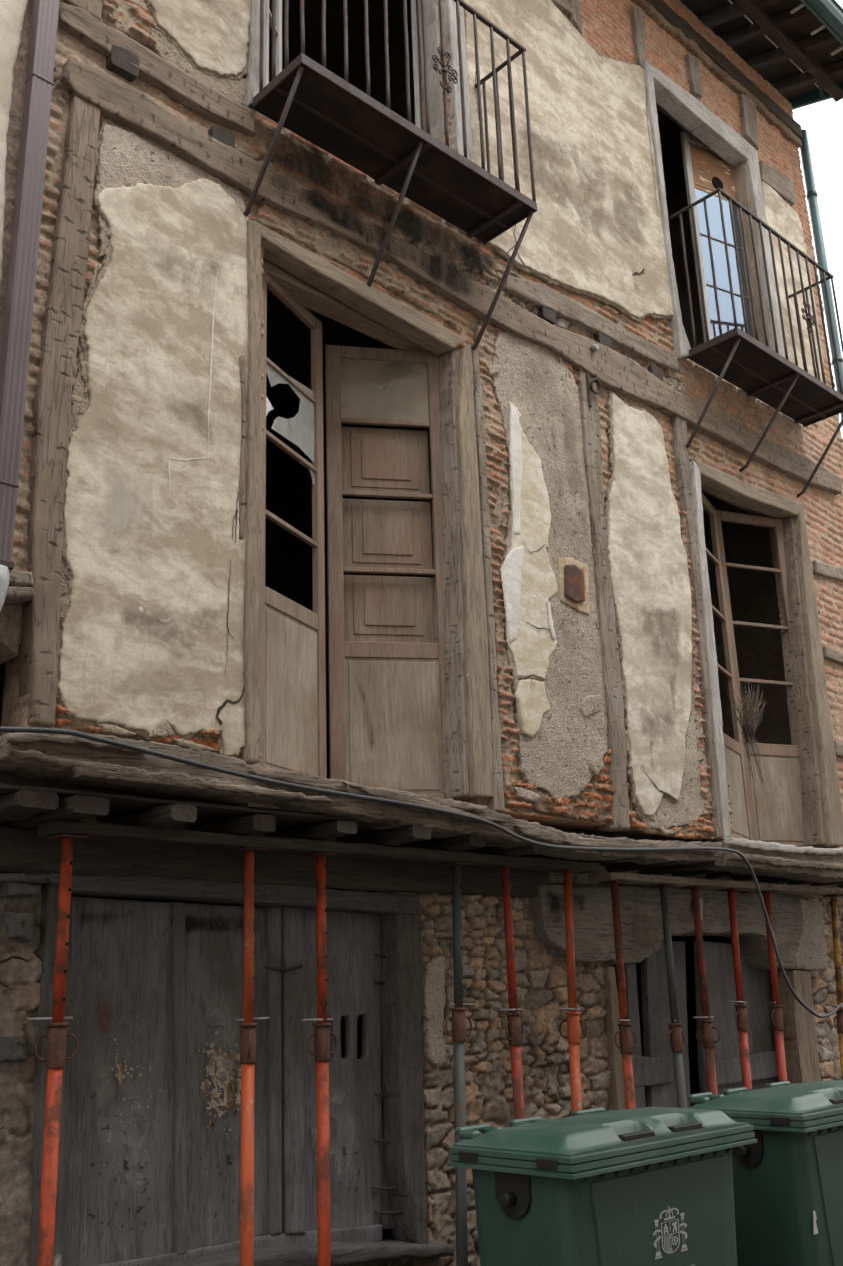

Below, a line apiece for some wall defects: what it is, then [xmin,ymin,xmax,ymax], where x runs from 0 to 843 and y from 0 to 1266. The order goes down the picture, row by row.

spalling [101,0,157,49]
damp [275,136,495,291]
peeling [255,204,615,823]
spalling [55,705,221,754]
crack [216,489,245,724]
spalling [629,507,721,840]
crack [0,956,28,990]